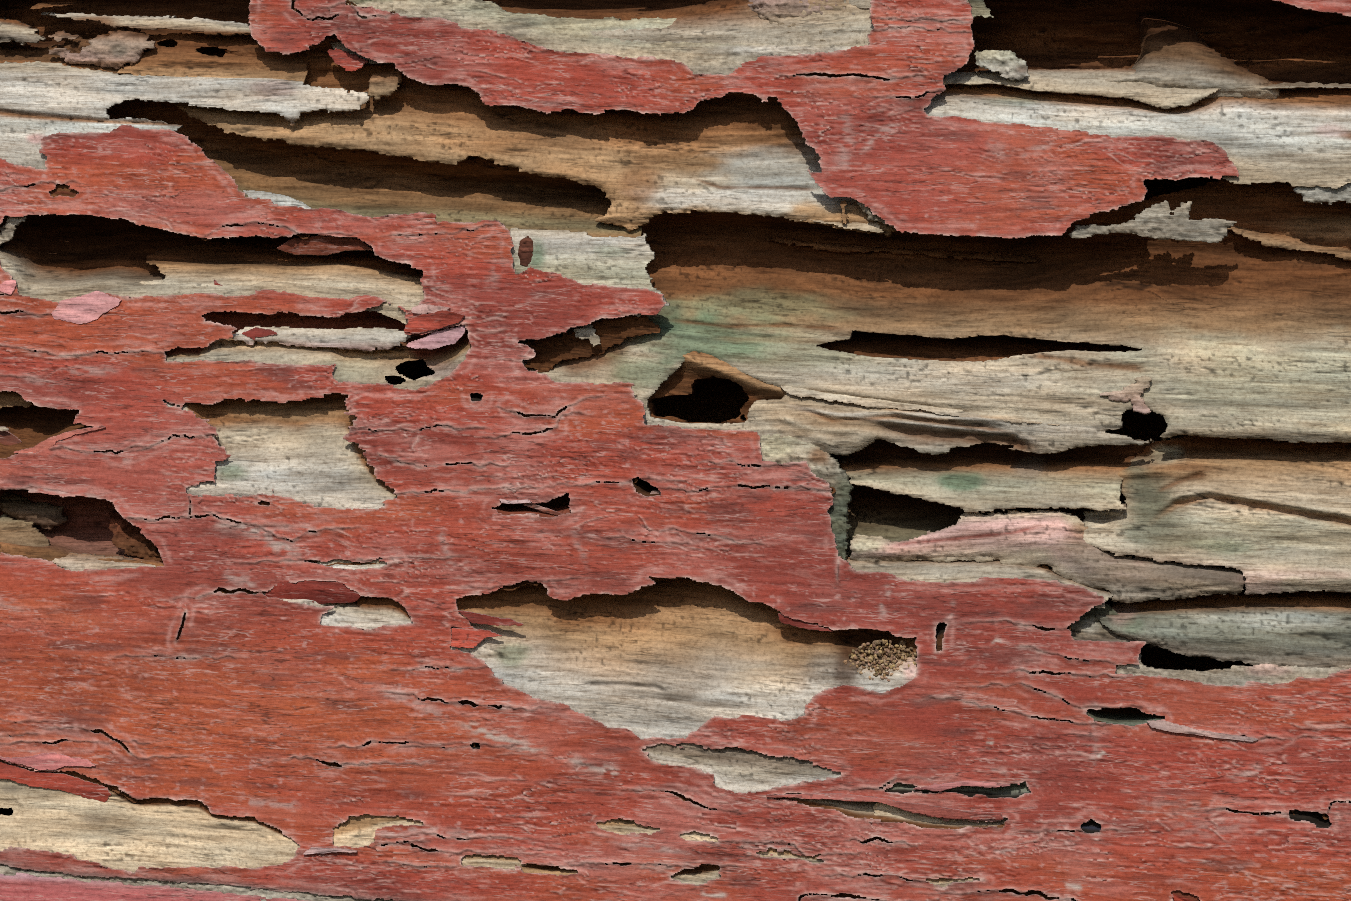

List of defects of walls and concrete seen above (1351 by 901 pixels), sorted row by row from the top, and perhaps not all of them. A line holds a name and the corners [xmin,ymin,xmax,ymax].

peeling [0,61,370,169]
peeling [510,228,670,306]
peeling [163,393,397,510]
crack [512,406,567,435]
peeling [253,580,413,630]
crack [418,666,502,709]
crack [994,625,1118,723]
crack [43,729,130,753]
peeling [0,752,424,873]
peeling [643,743,1031,829]
crack [798,837,913,901]
crack [977,889,1076,901]